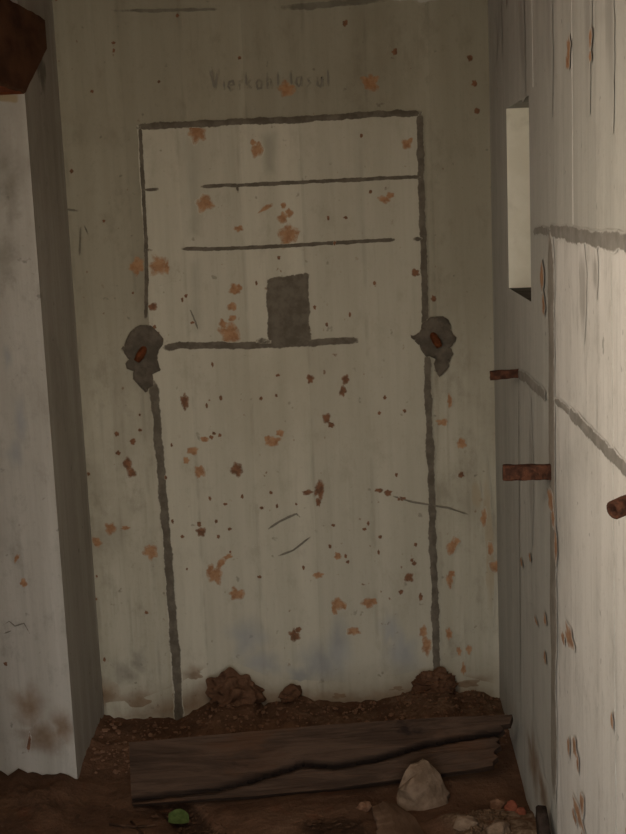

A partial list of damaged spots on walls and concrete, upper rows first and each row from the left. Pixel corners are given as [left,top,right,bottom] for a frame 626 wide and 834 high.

corrosion [256,201,302,260]
corrosion [128,250,172,280]
corrosion [216,282,243,342]
spalling [121,325,164,394]
spalling [410,316,457,378]
corrosion [115,450,137,479]
corrosion [229,460,244,479]
corrosion [301,477,325,508]
corrosion [204,550,246,601]
corrosion [287,626,302,643]
water stain [0,671,75,764]
corrosion [571,790,585,834]